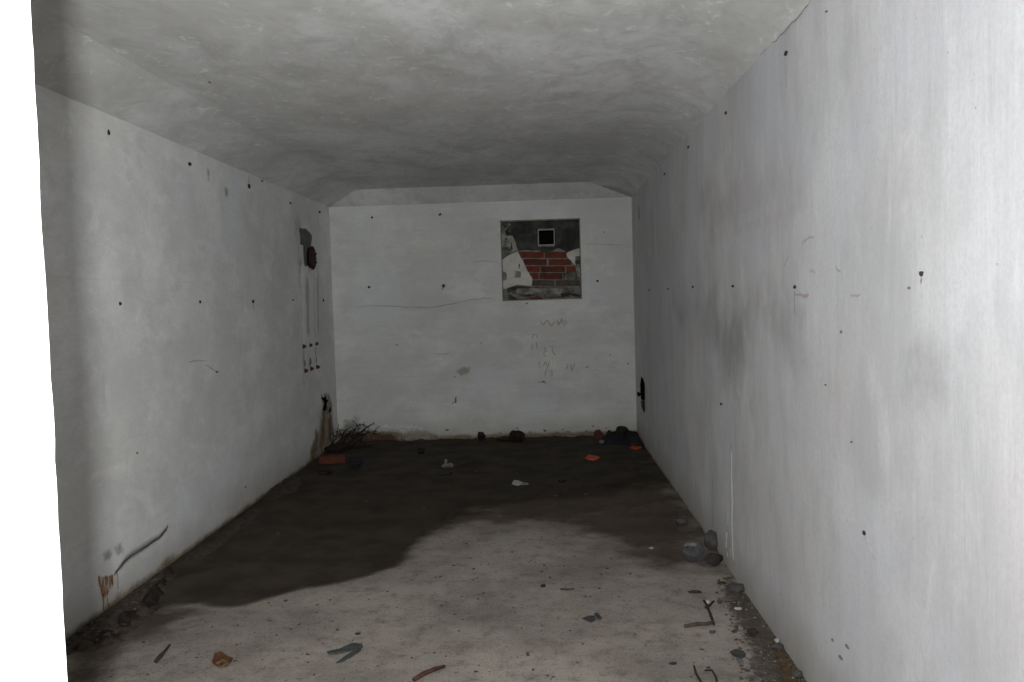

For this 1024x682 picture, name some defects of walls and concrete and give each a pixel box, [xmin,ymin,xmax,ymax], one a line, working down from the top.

spalling [501,220,580,300]
corrosion [310,413,333,463]
corrosion [98,572,118,610]